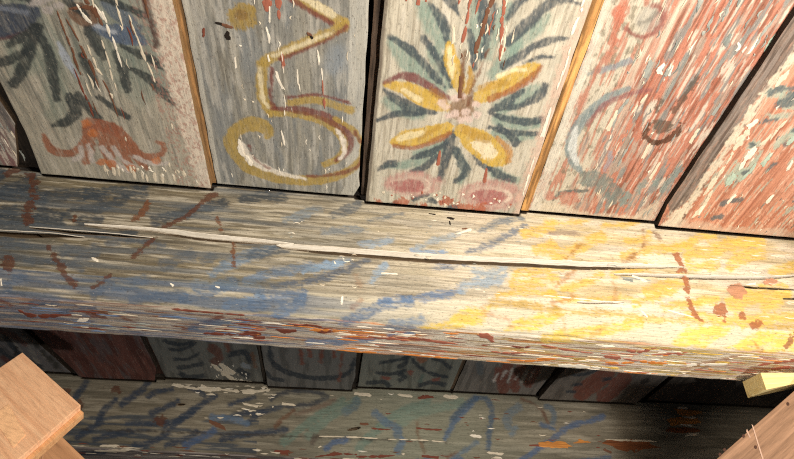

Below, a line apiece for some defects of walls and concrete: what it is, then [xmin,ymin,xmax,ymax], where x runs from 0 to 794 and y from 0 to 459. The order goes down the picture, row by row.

peeling [671,0,741,55]
peeling [723,14,778,56]
peeling [627,50,680,93]
peeling [605,94,654,167]
peeling [648,161,683,193]
peeling [691,119,794,228]
crack [0,223,794,300]
crack [577,298,624,306]